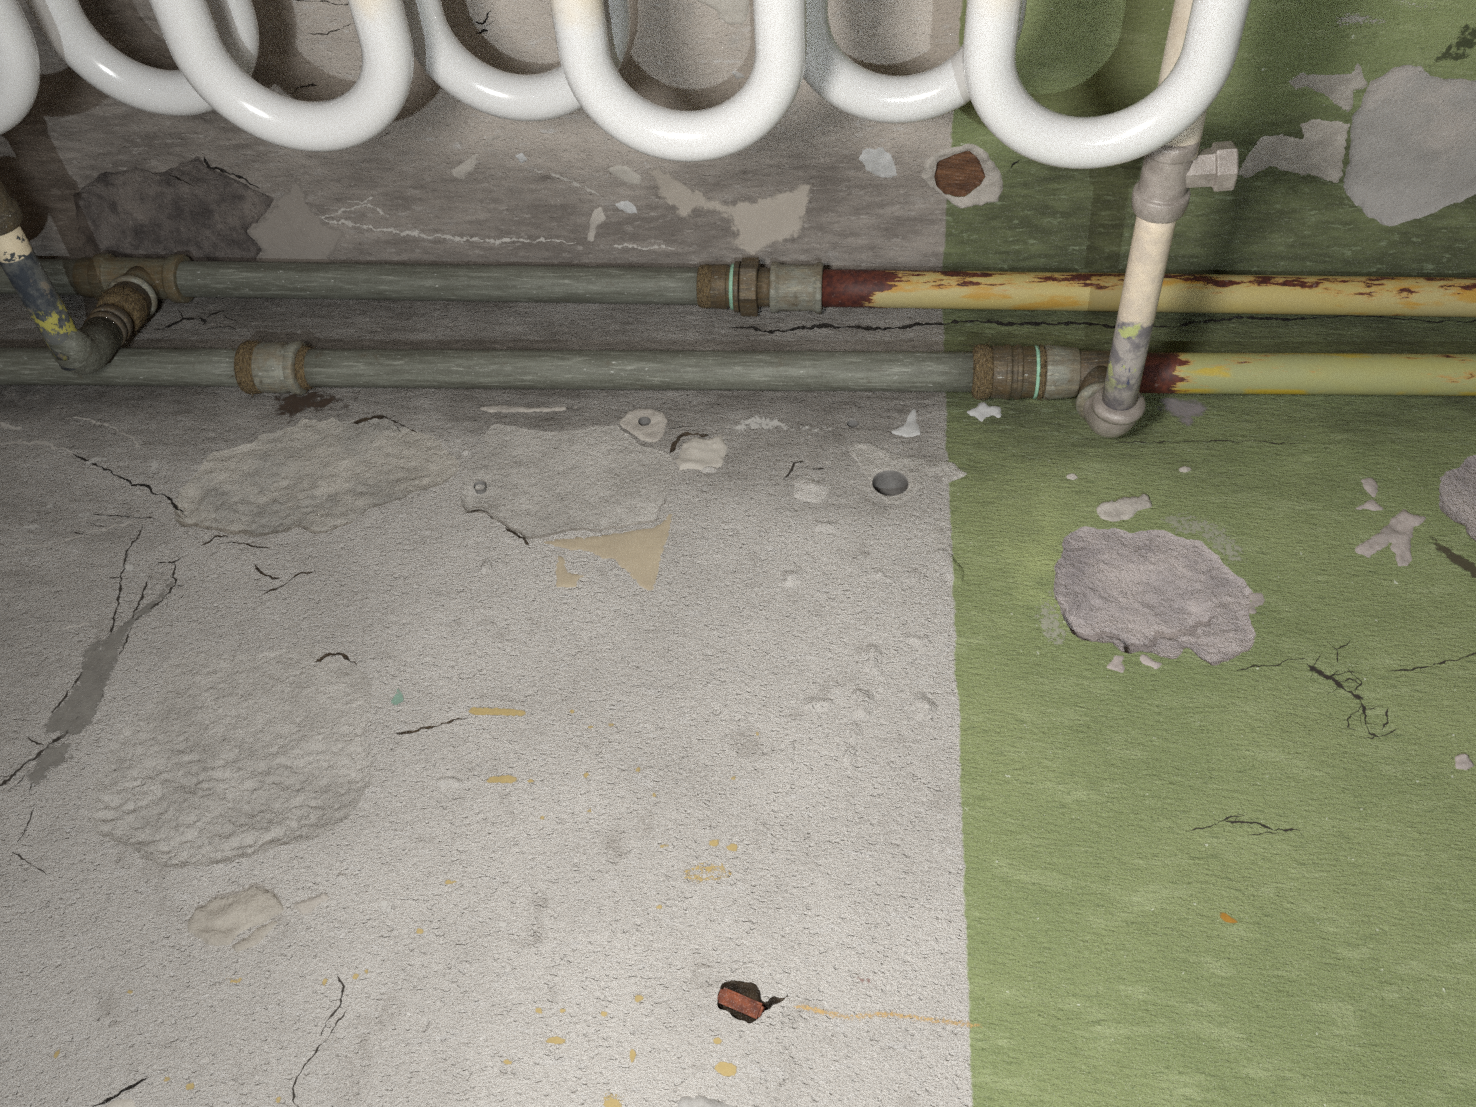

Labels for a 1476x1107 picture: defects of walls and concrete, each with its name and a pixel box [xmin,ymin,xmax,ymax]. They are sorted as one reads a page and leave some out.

flaking render [1239,64,1476,226]
crack [71,454,315,654]
flaking render [1034,494,1265,673]
flaking render [1355,455,1476,566]
crack [0,672,103,873]
crack [292,974,349,1107]
hole [717,980,789,1024]